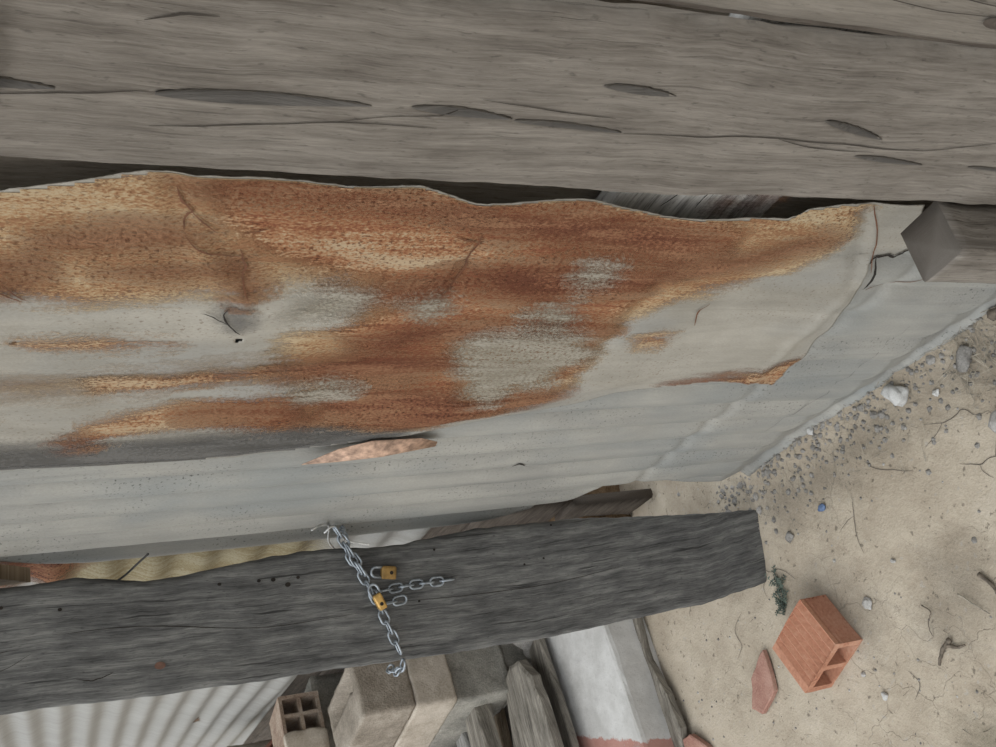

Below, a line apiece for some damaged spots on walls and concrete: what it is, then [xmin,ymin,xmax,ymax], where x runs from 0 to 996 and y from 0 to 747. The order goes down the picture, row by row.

crack [176,186,268,335]
corrosion [0,172,878,453]
crack [864,207,920,290]